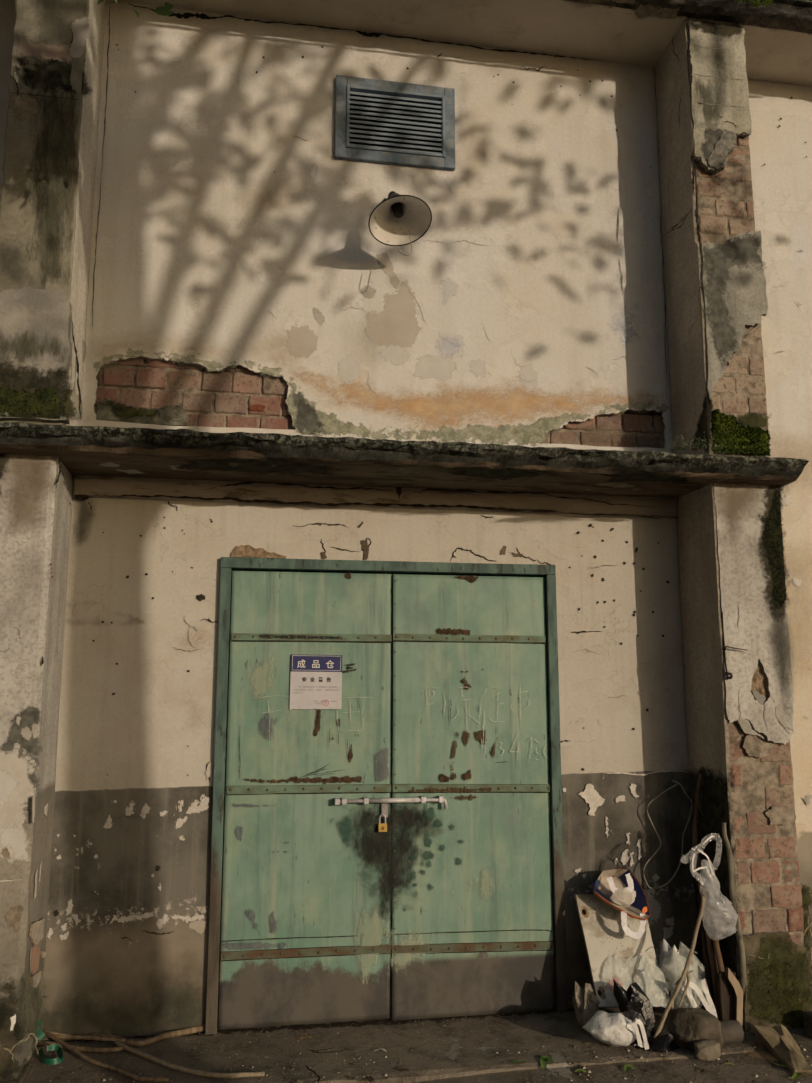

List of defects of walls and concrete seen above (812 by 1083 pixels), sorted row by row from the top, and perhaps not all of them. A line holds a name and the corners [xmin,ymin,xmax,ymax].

leakage [16,57,92,283]
crack [72,2,599,415]
flaking render [94,358,295,430]
leakage [94,348,667,447]
corrosion [436,628,470,636]
spalling [751,662,768,705]
peeling [111,794,209,841]
corrosion [244,776,362,784]
leakage [411,819,463,890]
corrosion [408,730,498,801]
peeling [562,784,639,837]
flaking render [728,719,812,946]